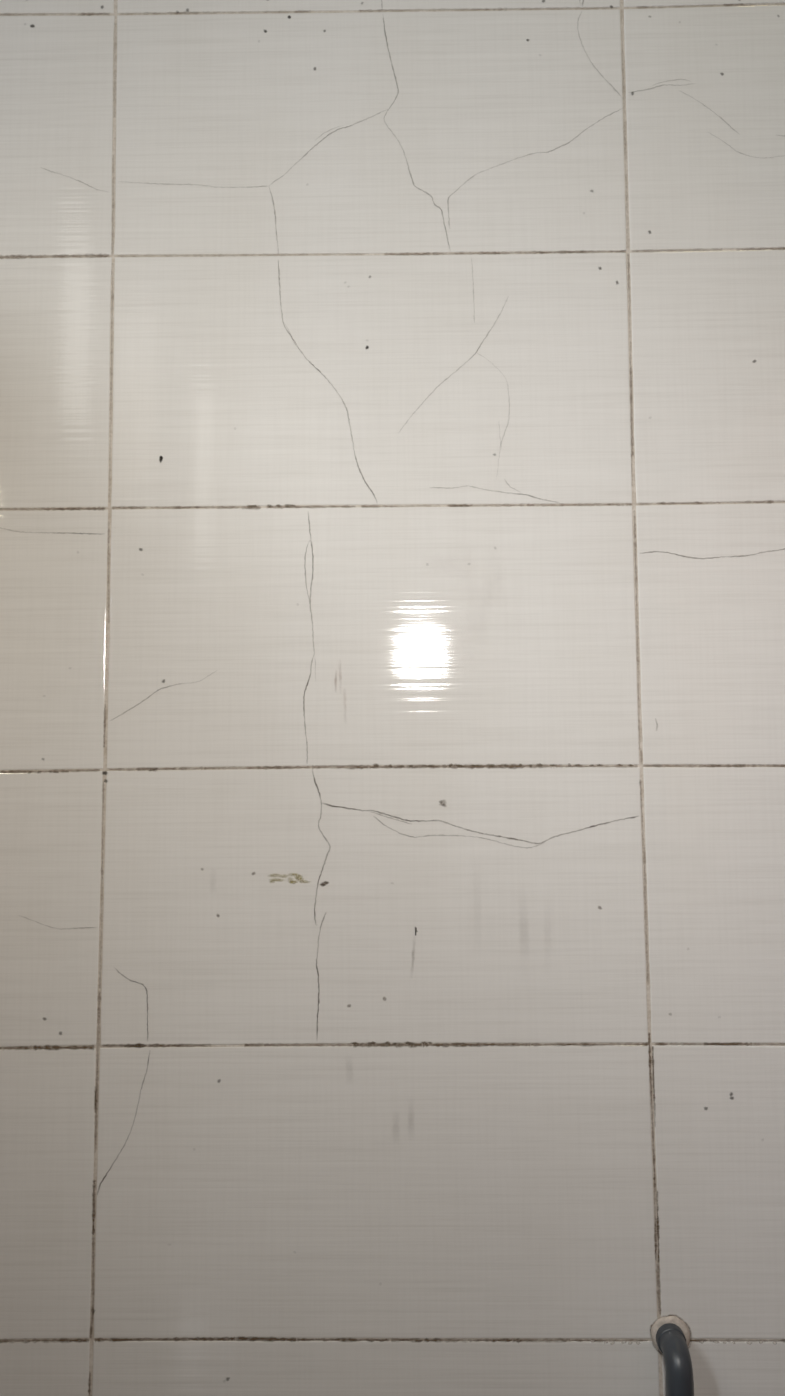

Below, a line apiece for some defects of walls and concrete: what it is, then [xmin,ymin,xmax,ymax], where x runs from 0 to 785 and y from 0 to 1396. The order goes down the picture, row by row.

crack [314,779,419,822]